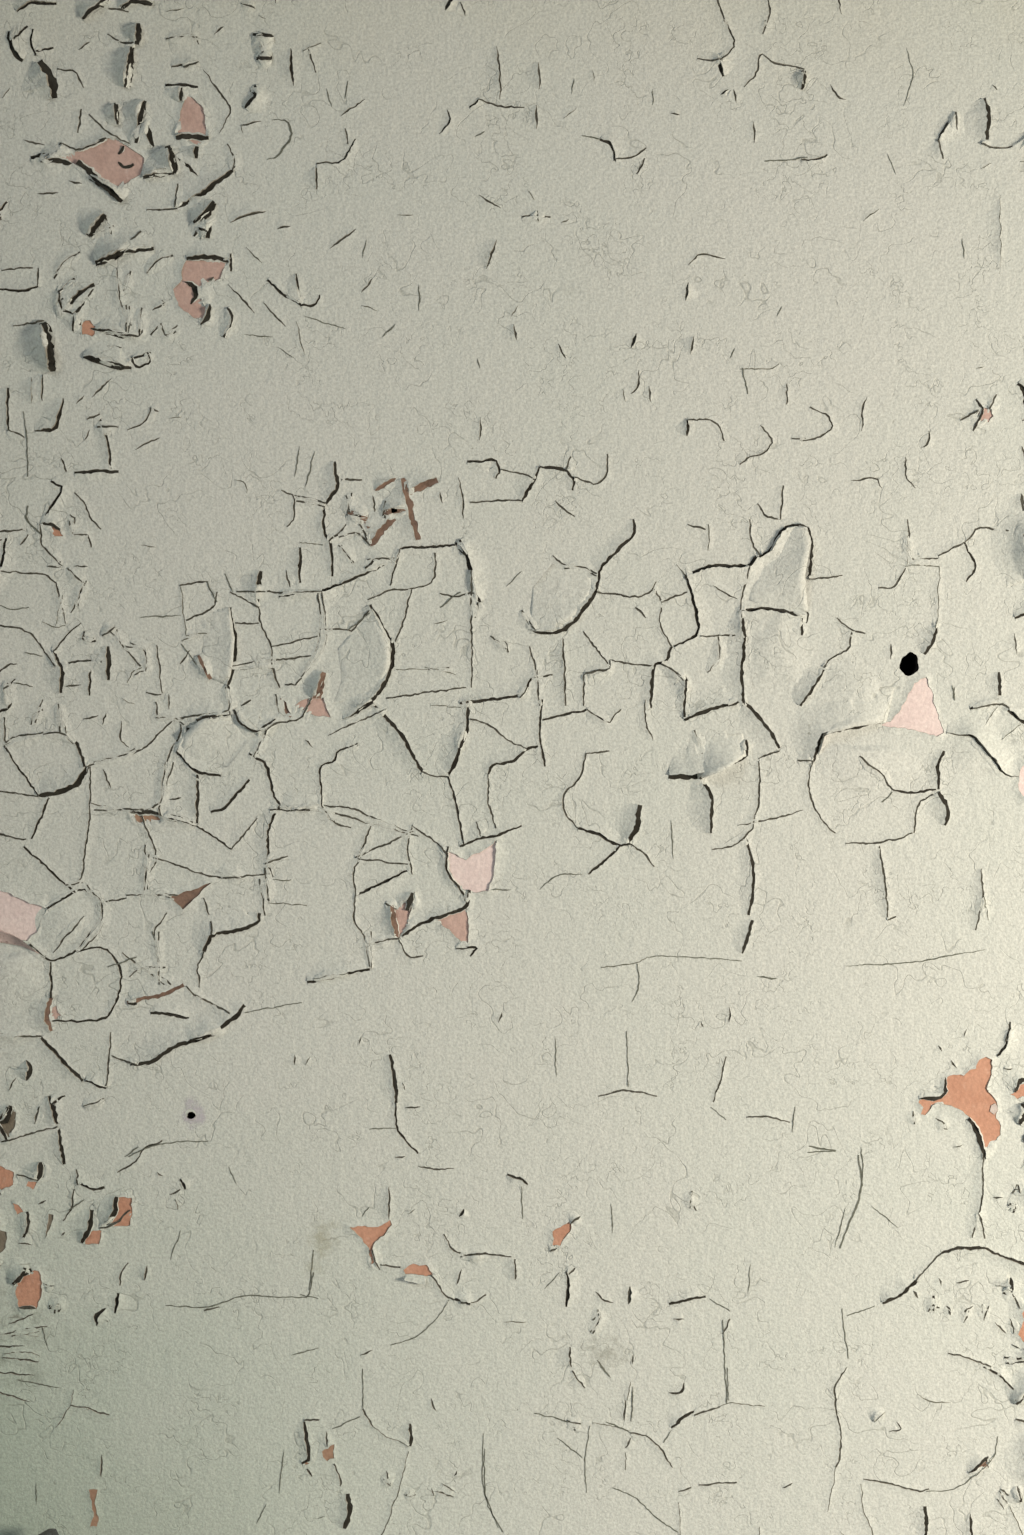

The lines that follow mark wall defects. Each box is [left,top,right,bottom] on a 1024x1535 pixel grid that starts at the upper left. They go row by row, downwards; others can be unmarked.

peeling [59,127,151,194]
crack [927,82,1024,268]
peeling [166,253,230,330]
crack [0,0,957,1286]
peeling [819,669,948,753]
crack [878,493,1024,659]
crack [946,672,1024,781]
peeling [382,840,509,946]
peeling [910,1047,1024,1158]
peeling [0,1098,61,1316]
crack [257,1036,767,1535]
crack [781,1021,1024,1535]